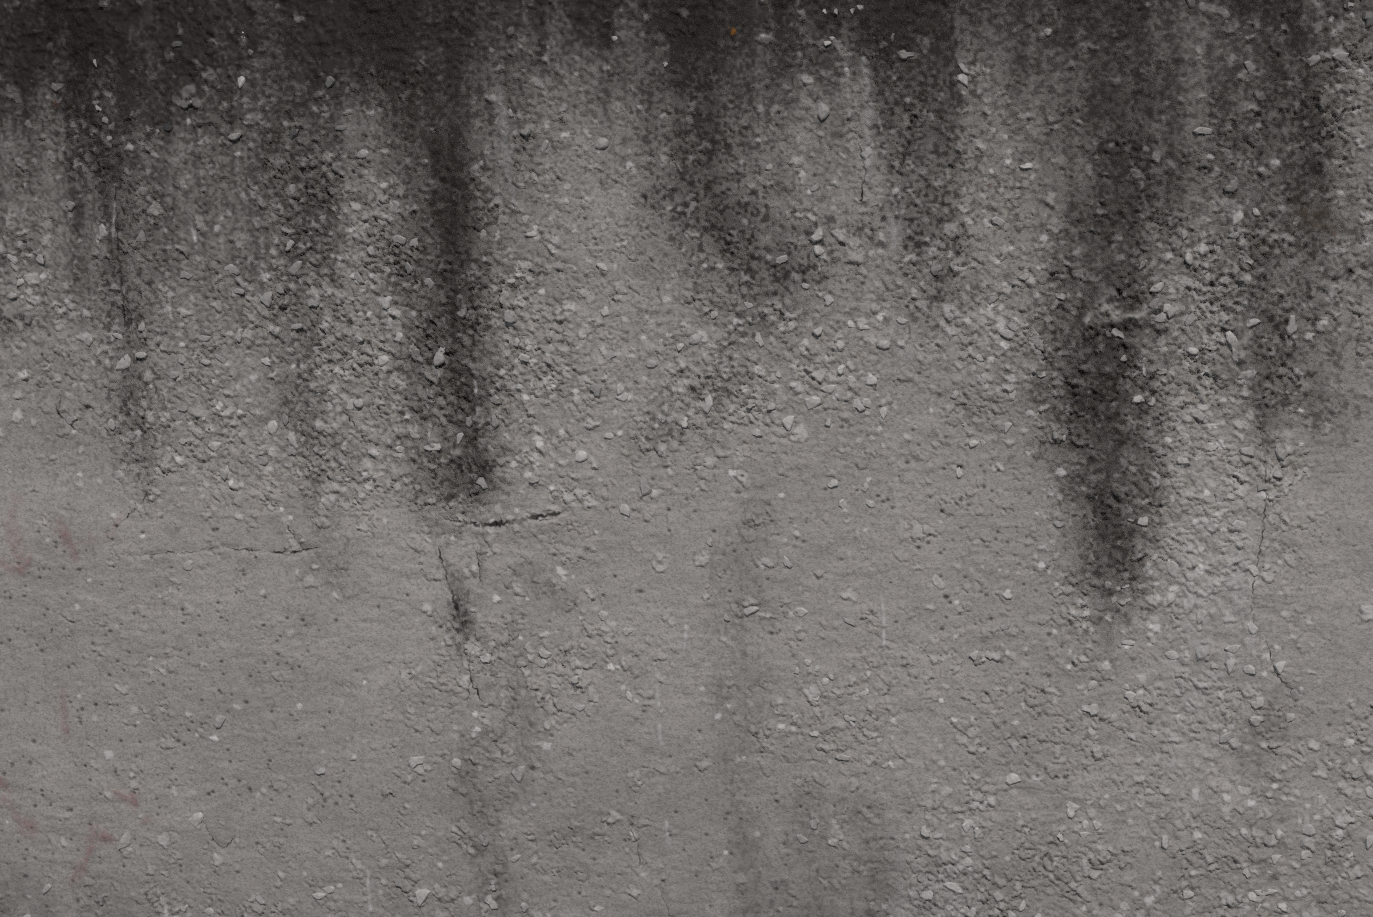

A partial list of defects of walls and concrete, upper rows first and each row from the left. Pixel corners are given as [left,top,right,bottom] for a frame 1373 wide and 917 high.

water stain [0,0,1373,284]
crack [439,511,560,610]